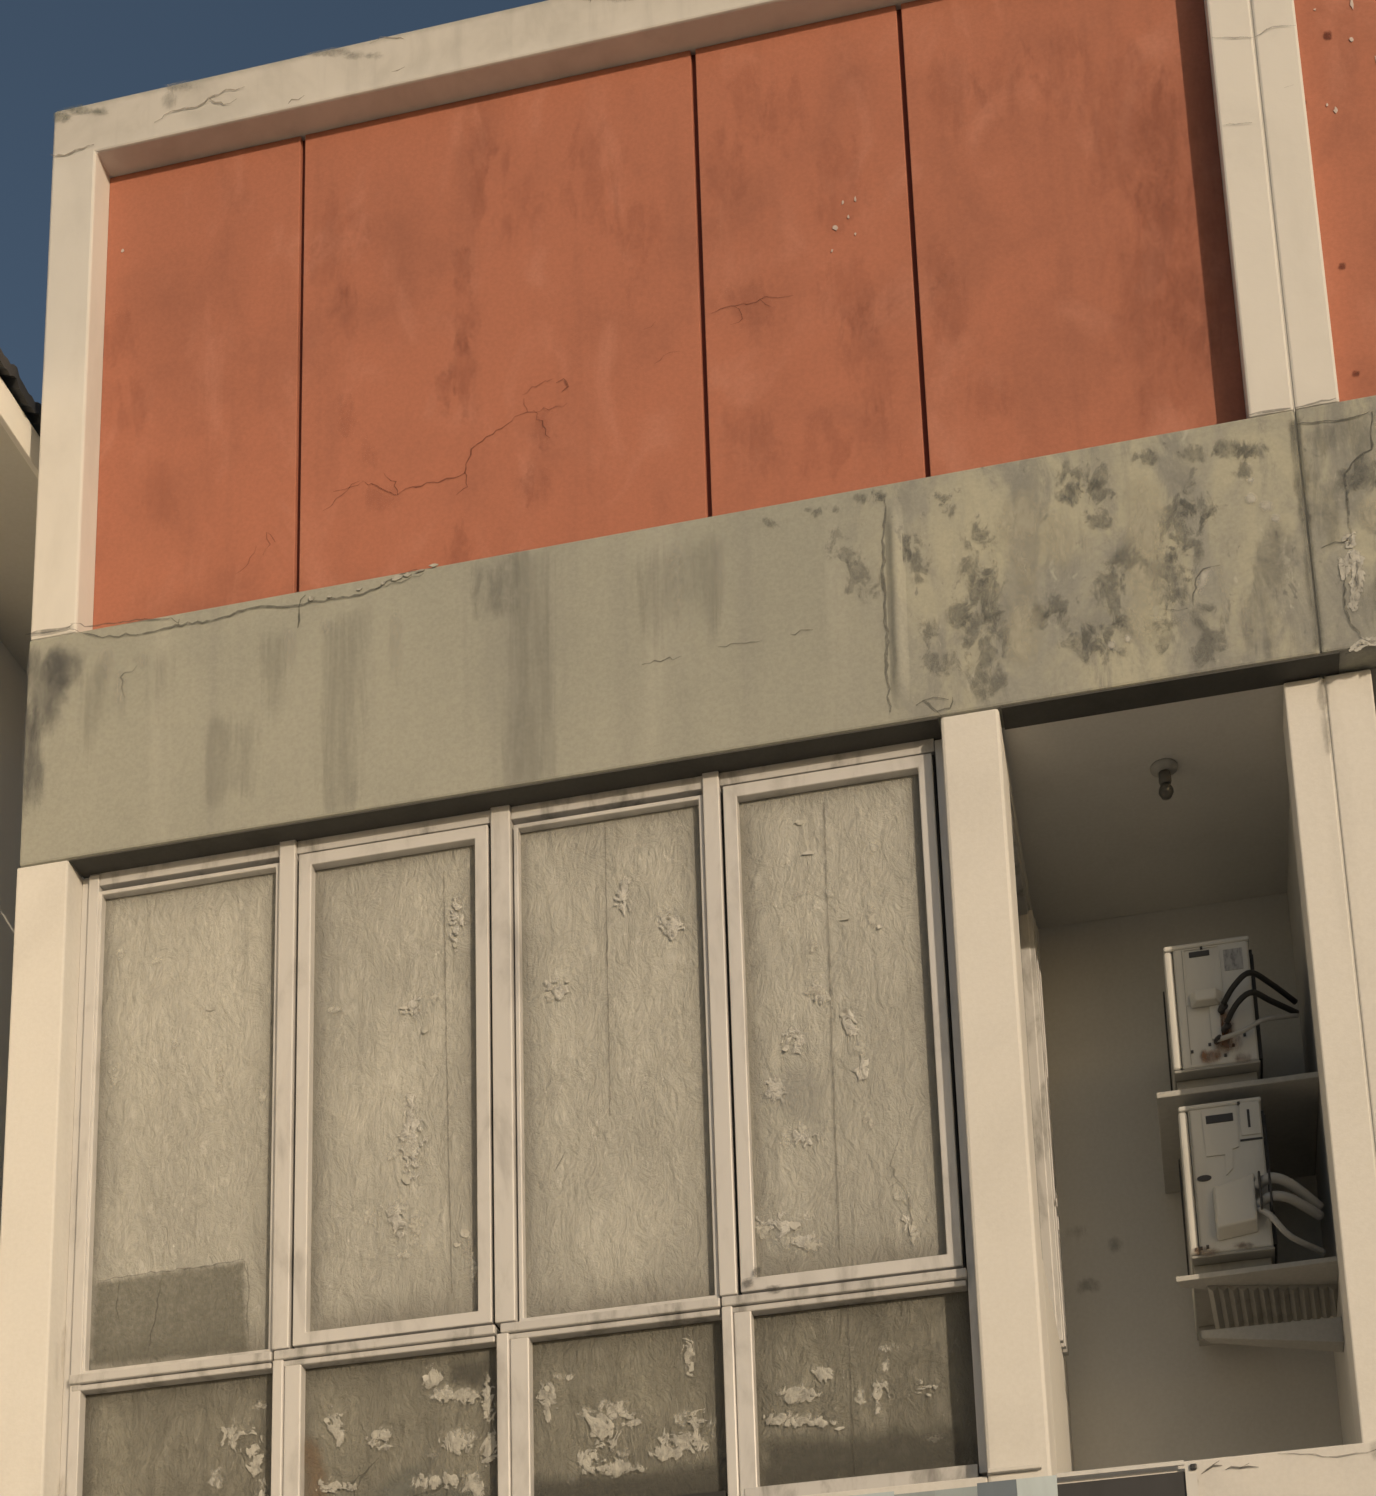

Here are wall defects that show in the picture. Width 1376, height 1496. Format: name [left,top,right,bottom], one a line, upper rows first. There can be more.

crack [1249,398,1374,642]
crack [25,569,424,697]
crack [881,497,953,712]
spalling [1349,636,1376,652]
peeling [221,1418,266,1496]
peeling [316,1477,357,1493]
peeling [412,1363,498,1496]
peeling [536,1374,573,1424]
peeling [568,1400,714,1484]
peeling [682,1334,695,1376]
peeling [763,1364,845,1431]
peeling [855,1346,898,1414]